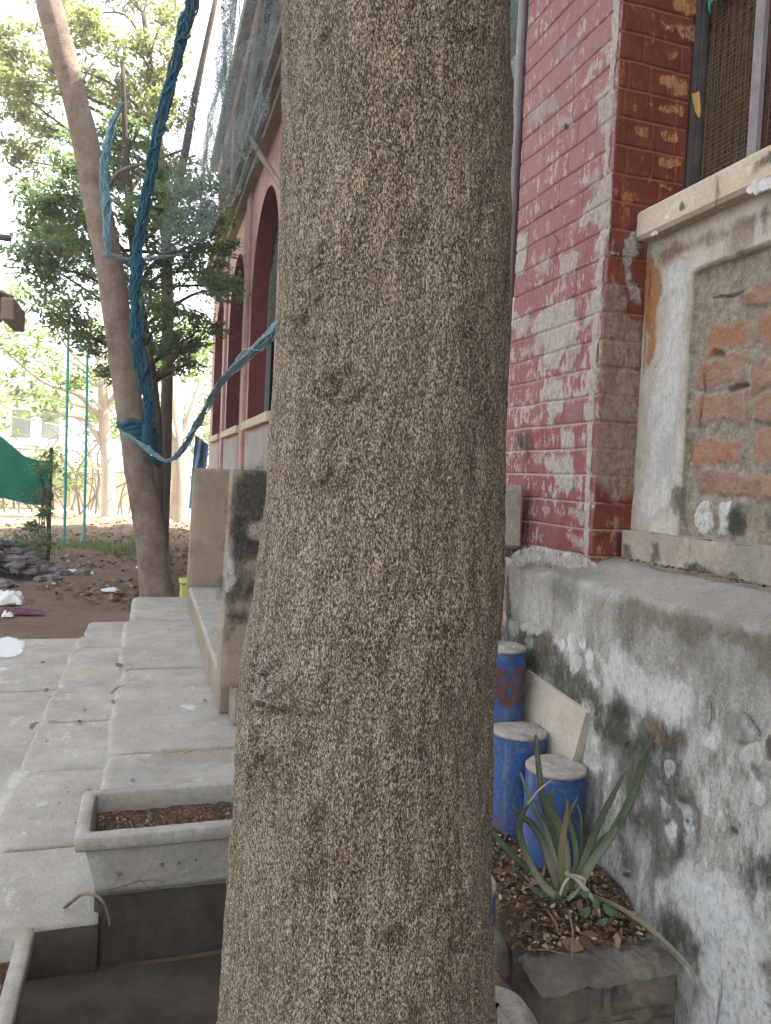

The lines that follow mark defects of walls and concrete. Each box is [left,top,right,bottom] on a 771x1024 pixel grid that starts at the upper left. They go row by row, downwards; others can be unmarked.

peeling [597,84,615,136]
peeling [579,170,619,256]
peeling [515,231,529,276]
peeling [511,261,684,519]
water stain [220,573,253,623]
water stain [228,467,267,560]
spalling [511,510,597,572]
water stain [684,563,737,580]
peeling [719,500,732,535]
water stain [626,597,771,669]
water stain [500,558,694,867]
water stain [658,907,698,972]